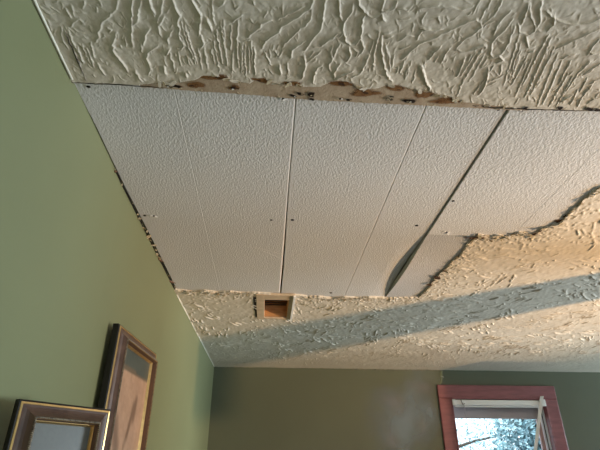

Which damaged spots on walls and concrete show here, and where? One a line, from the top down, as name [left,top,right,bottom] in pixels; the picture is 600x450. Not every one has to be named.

peeling [140,75,529,111]
spalling [463,191,600,247]